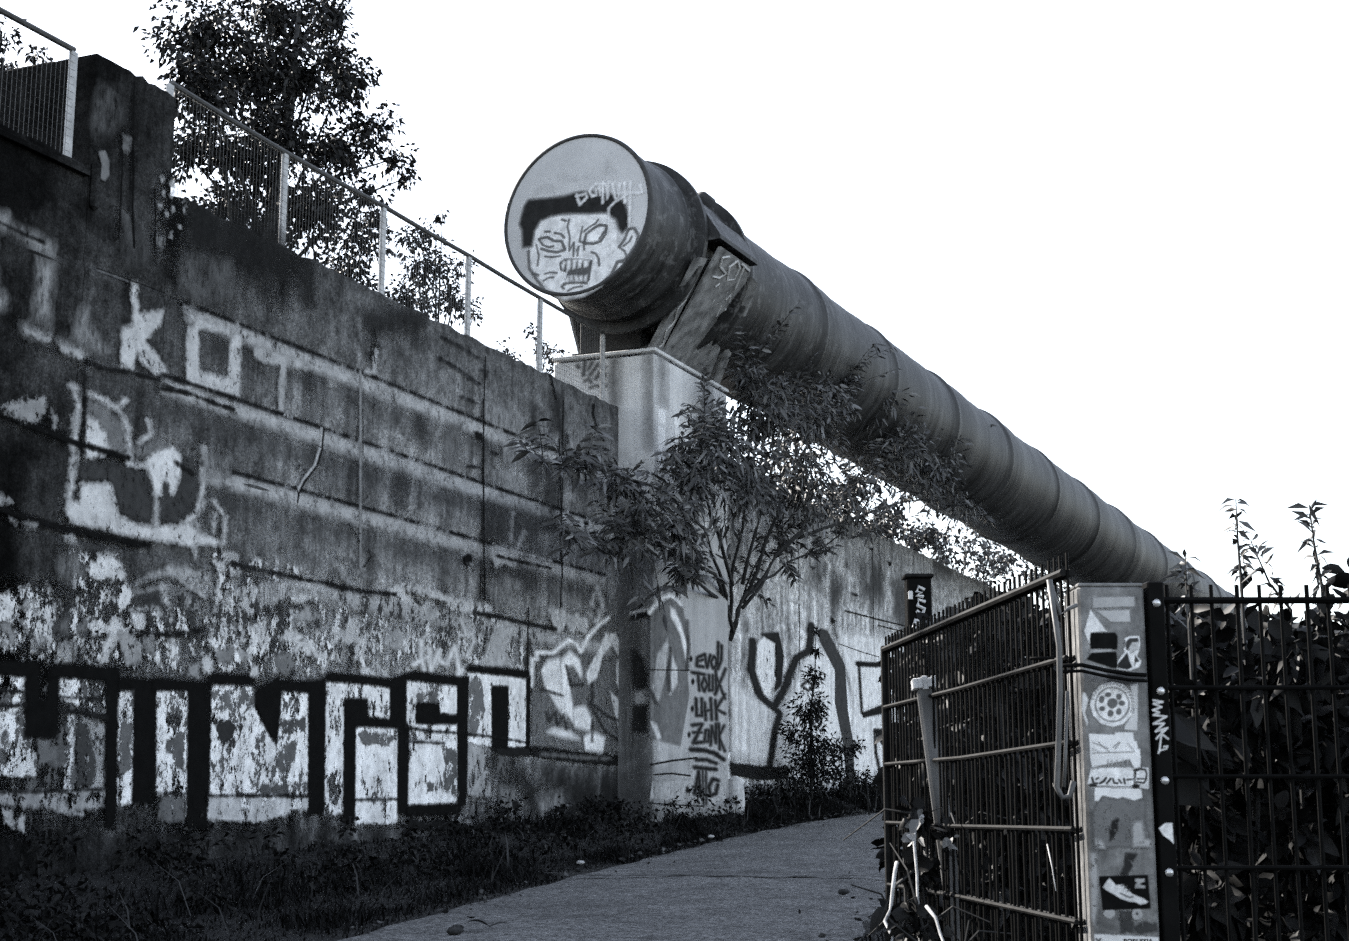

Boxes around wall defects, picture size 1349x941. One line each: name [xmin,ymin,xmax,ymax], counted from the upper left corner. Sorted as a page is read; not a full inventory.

spalling [0,222,45,244]
peeling [0,327,611,527]
peeling [0,461,618,833]